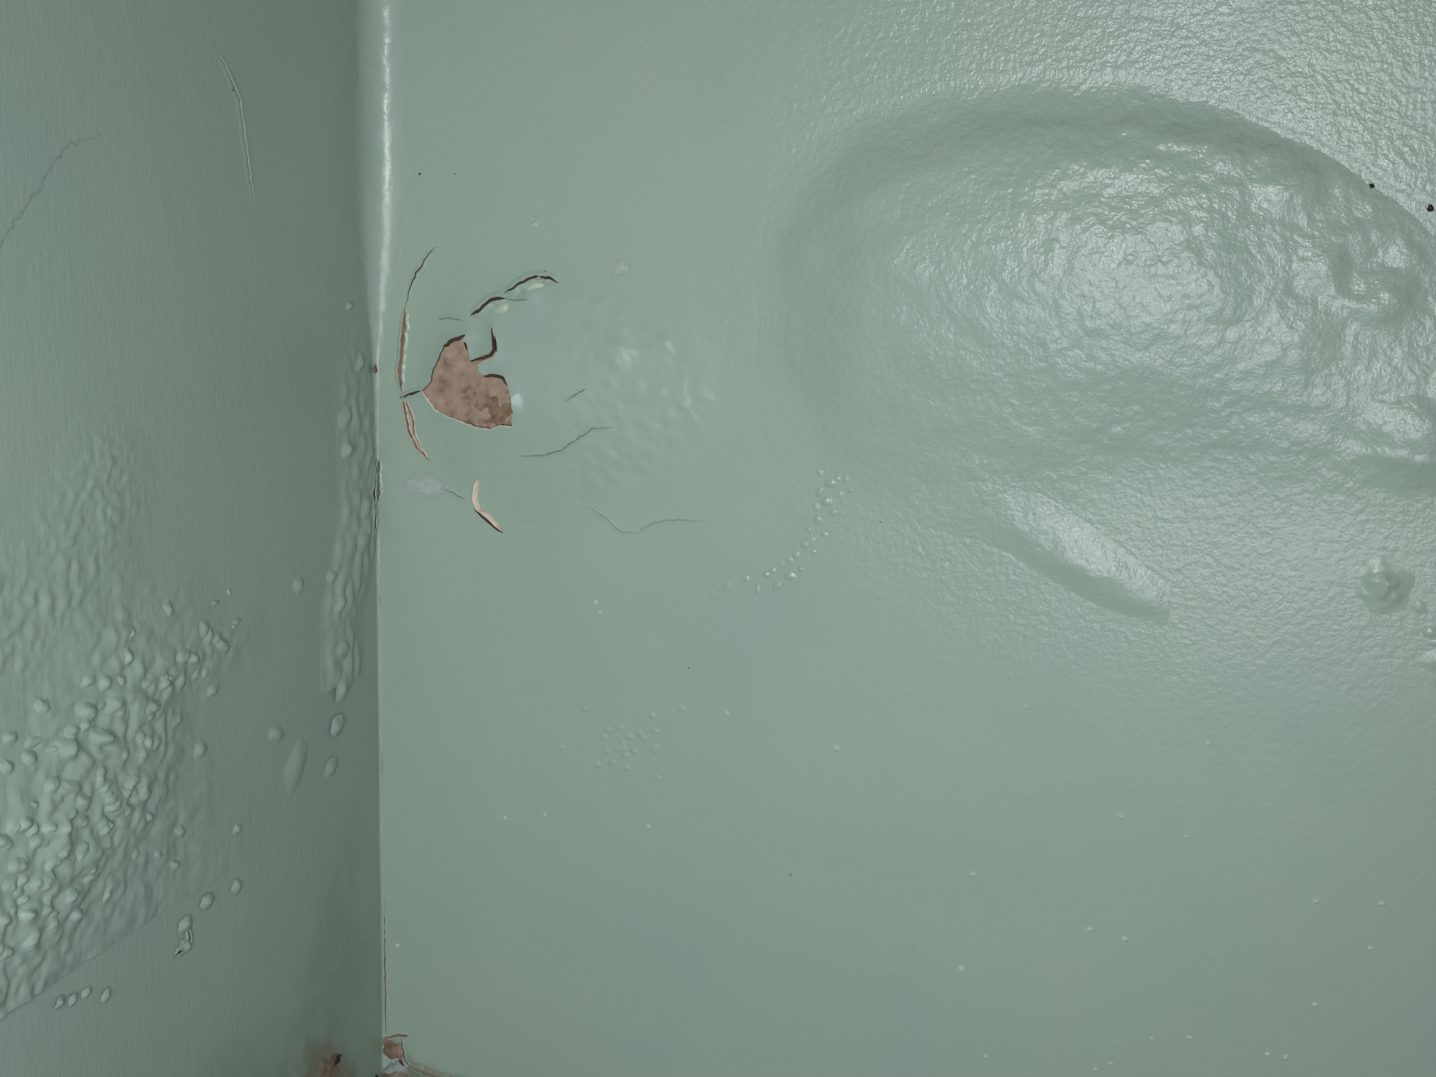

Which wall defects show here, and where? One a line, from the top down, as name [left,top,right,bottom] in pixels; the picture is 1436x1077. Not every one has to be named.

crack [0,133,100,251]
peeling [422,327,513,431]
peeling [472,479,503,533]